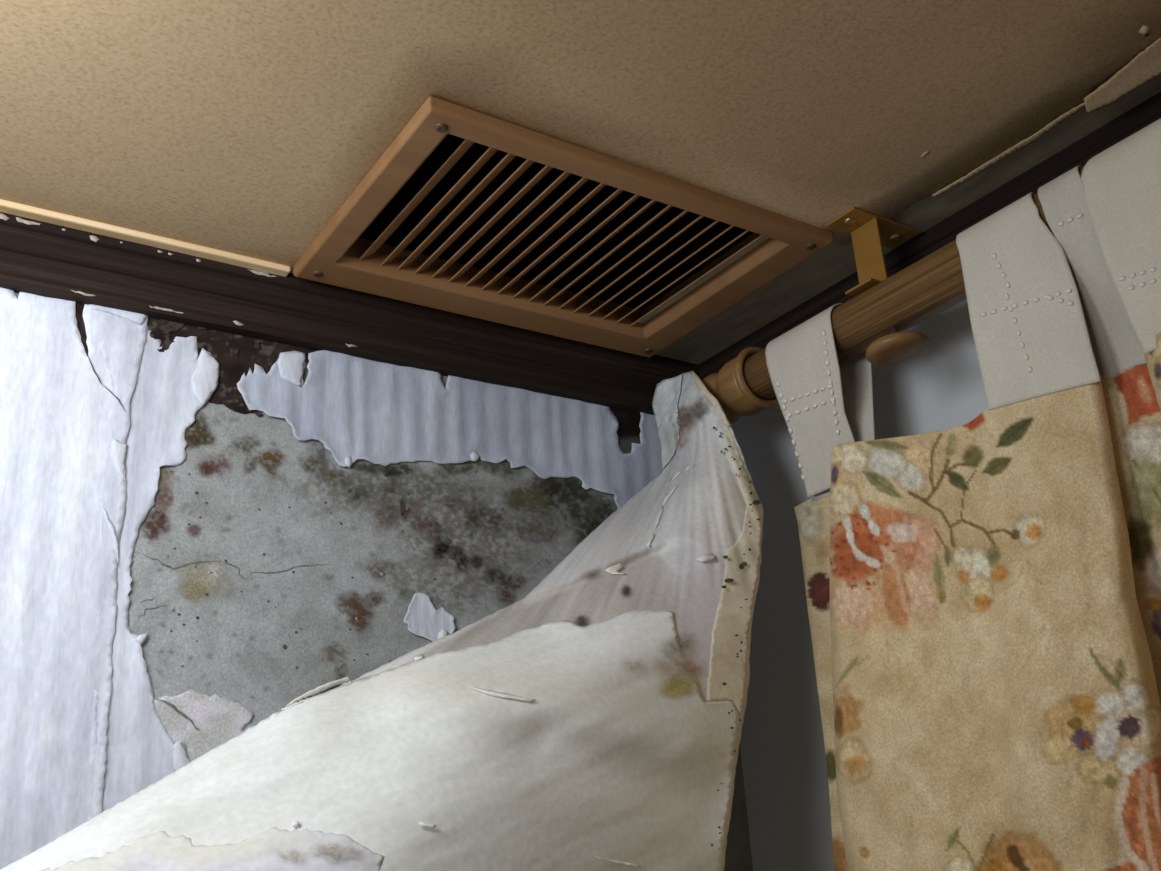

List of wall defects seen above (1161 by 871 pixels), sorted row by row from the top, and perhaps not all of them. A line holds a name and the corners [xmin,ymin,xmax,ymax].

mould [185,417,214,446]
mould [677,402,706,446]
mould [188,459,227,475]
spalling [100,349,618,731]
damp [304,449,613,603]
mould [722,548,751,589]
damp [658,640,696,696]